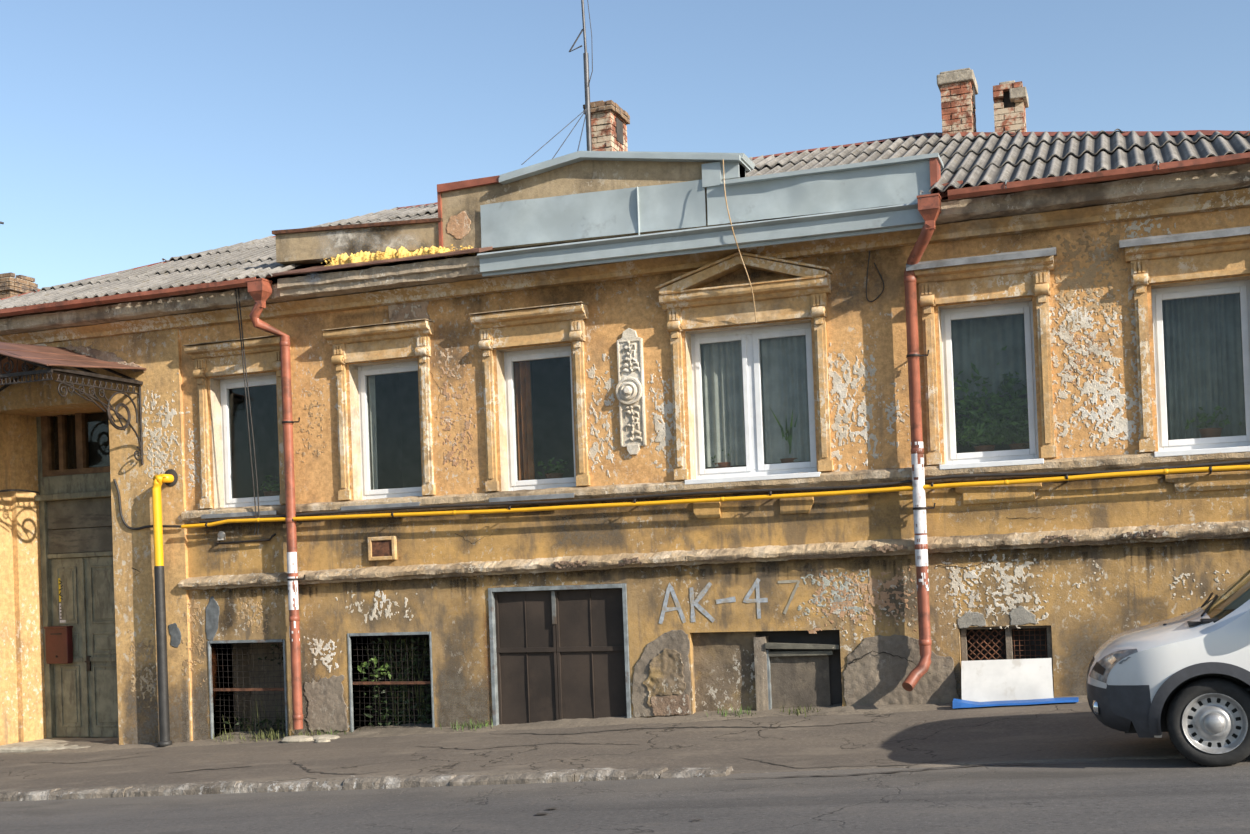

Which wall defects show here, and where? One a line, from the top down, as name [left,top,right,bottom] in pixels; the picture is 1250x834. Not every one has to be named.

spalling [446,211,471,239]
peeling [1047,217,1176,454]
peeling [586,353,618,484]
peeling [648,360,675,471]
peeling [827,343,909,472]
peeling [303,636,342,673]
peeling [335,589,417,623]
peeling [935,553,1059,630]